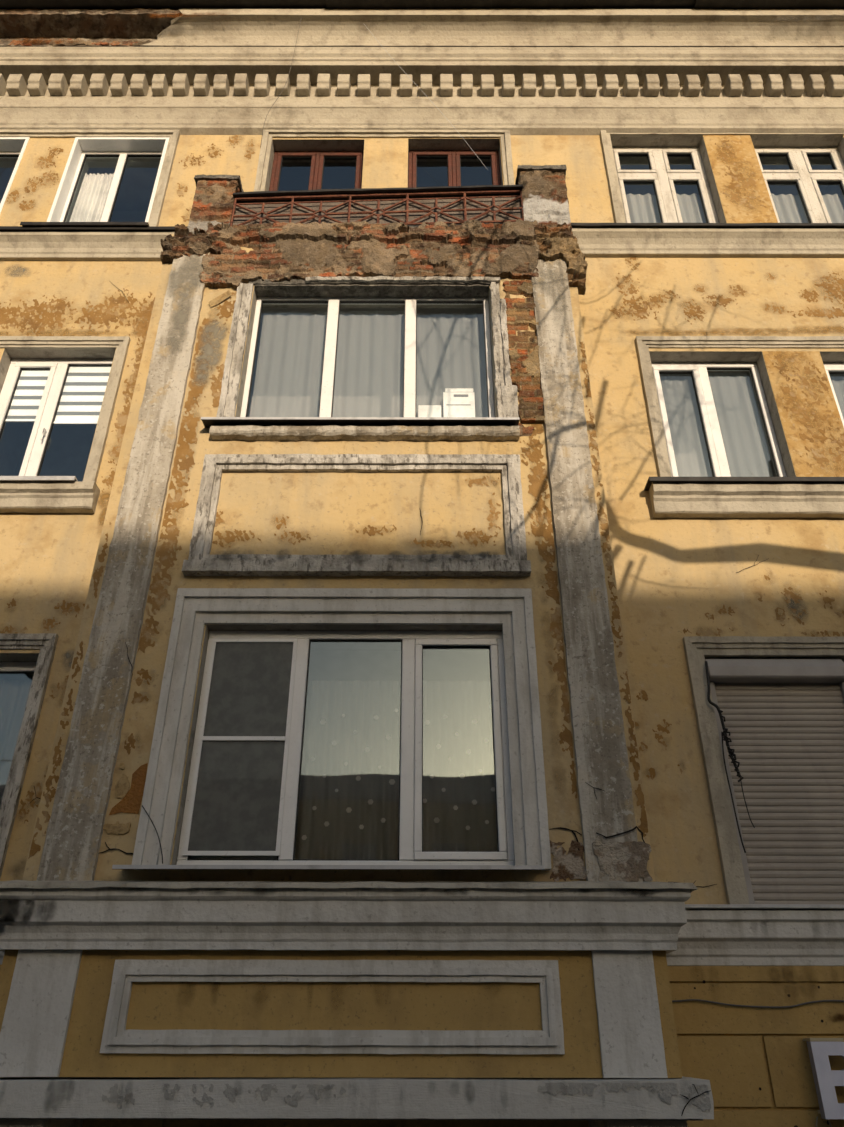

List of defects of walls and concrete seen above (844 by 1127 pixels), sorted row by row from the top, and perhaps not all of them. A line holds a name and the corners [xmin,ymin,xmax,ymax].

spalling [9,38,151,47]
peeling [179,135,255,167]
peeling [609,257,747,325]
peeling [764,272,844,319]
peeling [0,288,155,494]
peeling [772,354,844,469]
spalling [138,183,588,798]
peeling [579,342,623,658]
peeling [131,668,152,705]